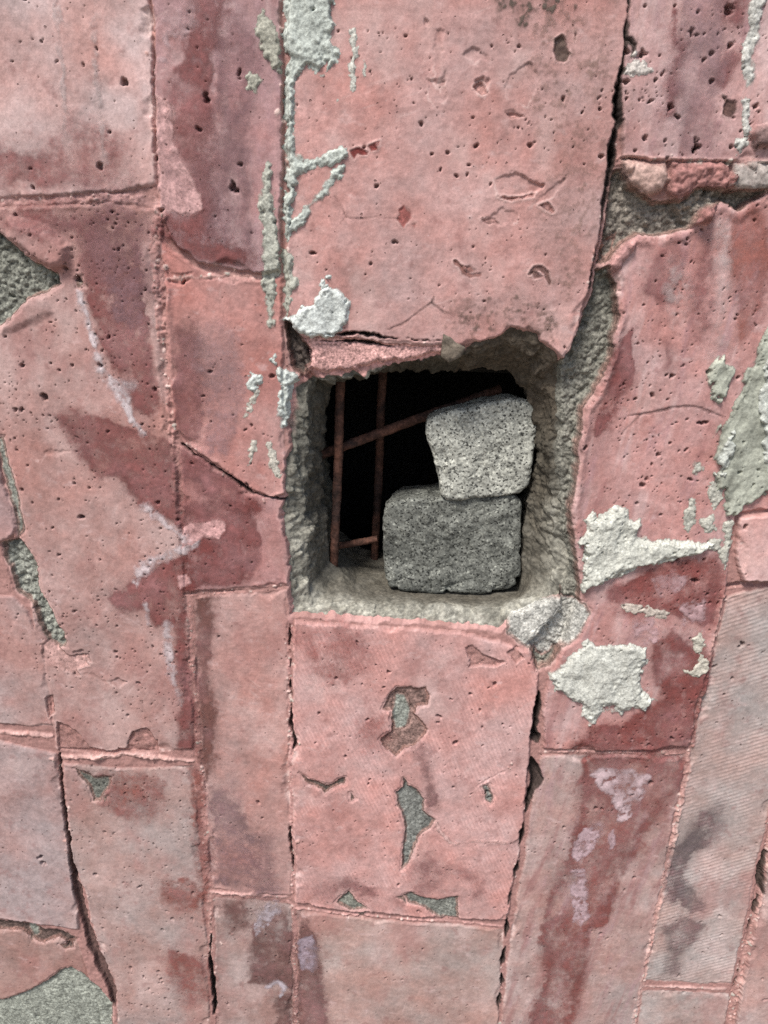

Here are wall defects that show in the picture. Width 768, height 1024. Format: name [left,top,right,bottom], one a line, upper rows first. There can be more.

crack [589,0,636,289]
spalling [0,233,61,325]
spalling [0,437,90,675]
leakage [5,208,277,908]
crack [183,443,286,500]
spalling [246,169,768,669]
spalling [0,967,113,1024]
crack [60,753,117,1006]
spalling [381,686,429,756]
spalling [396,779,435,868]
crack [497,691,544,1009]
leakage [529,559,724,1024]